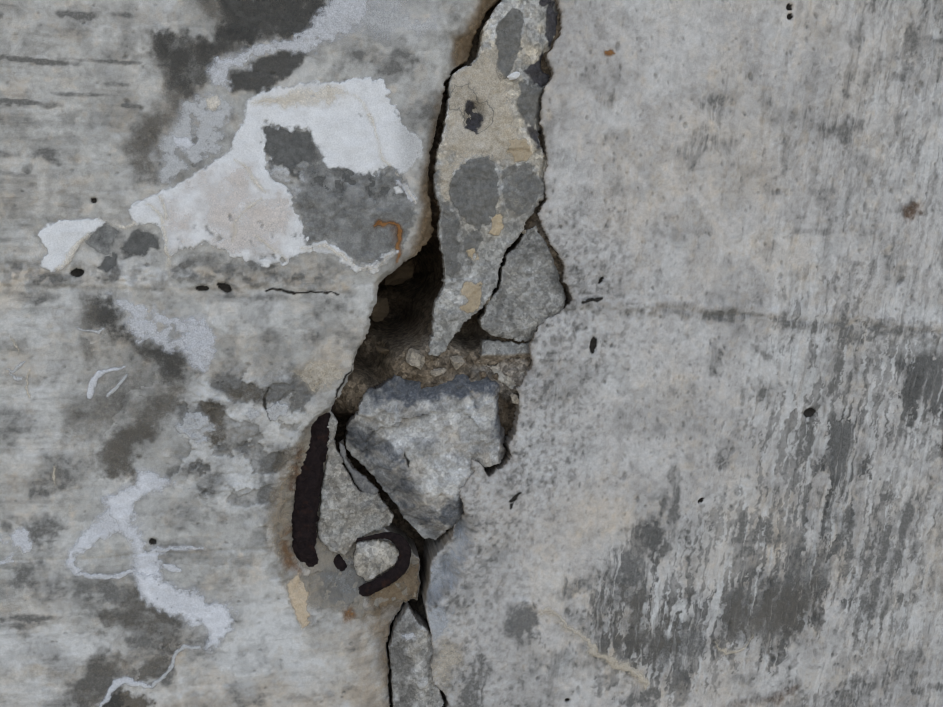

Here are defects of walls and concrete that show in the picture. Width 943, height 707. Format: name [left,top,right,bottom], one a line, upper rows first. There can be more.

leakage [125,0,438,184]
crack [541,0,561,88]
peeling [38,77,422,274]
crack [504,201,603,304]
leakage [66,297,237,707]
spalling [175,400,226,444]
spalling [230,384,289,421]
spalling [271,426,420,628]
crack [332,0,531,706]
leakage [592,520,845,686]
leakage [815,409,872,538]
leakage [898,355,943,426]